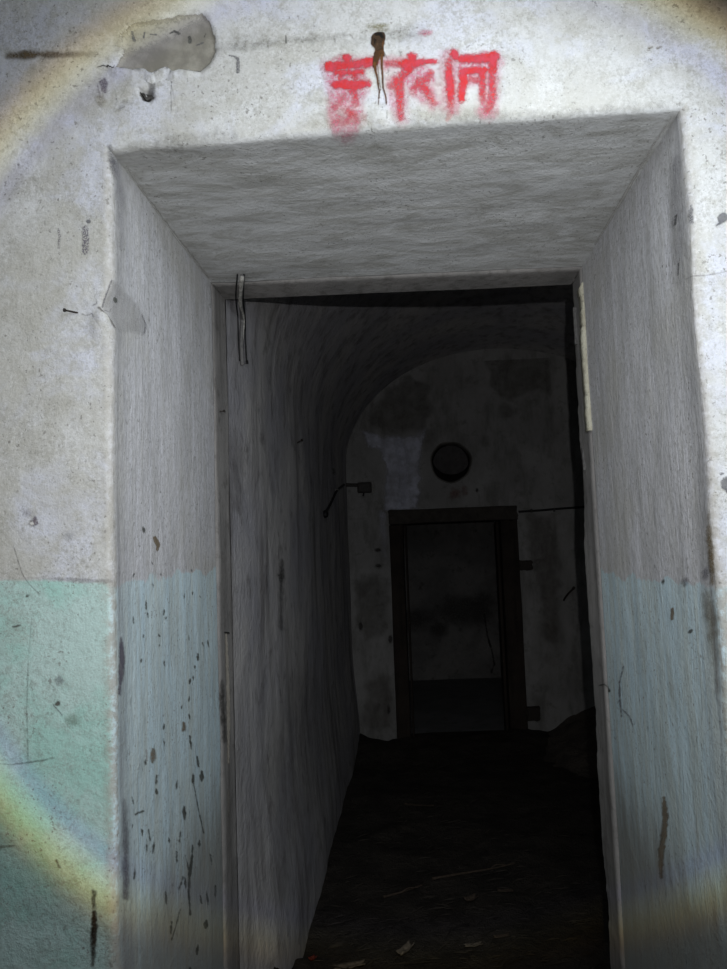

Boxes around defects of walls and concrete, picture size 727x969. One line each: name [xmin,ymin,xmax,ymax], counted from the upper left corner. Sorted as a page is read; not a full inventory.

spalling [99,14,216,102]
corrosion [371,32,387,105]
efflorescence [364,432,424,510]